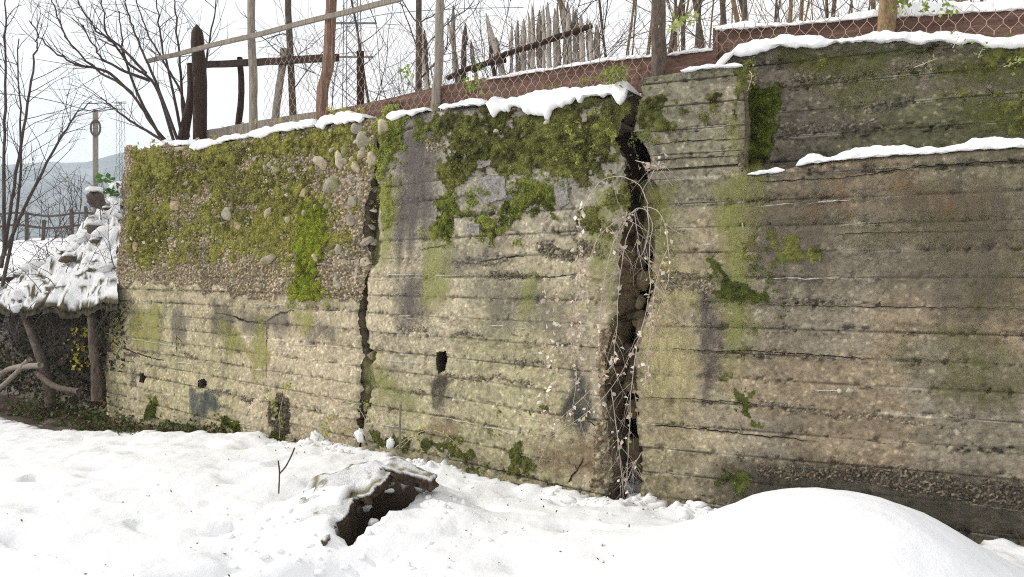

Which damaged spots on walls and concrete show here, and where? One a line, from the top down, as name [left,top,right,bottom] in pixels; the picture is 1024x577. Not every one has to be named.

crack [385,101,402,114]
crack [368,180,382,257]
leakage [381,126,435,258]
crack [217,310,294,366]
leakage [388,238,459,326]
crack [569,119,807,497]
leakage [189,388,218,417]
crack [363,341,389,419]